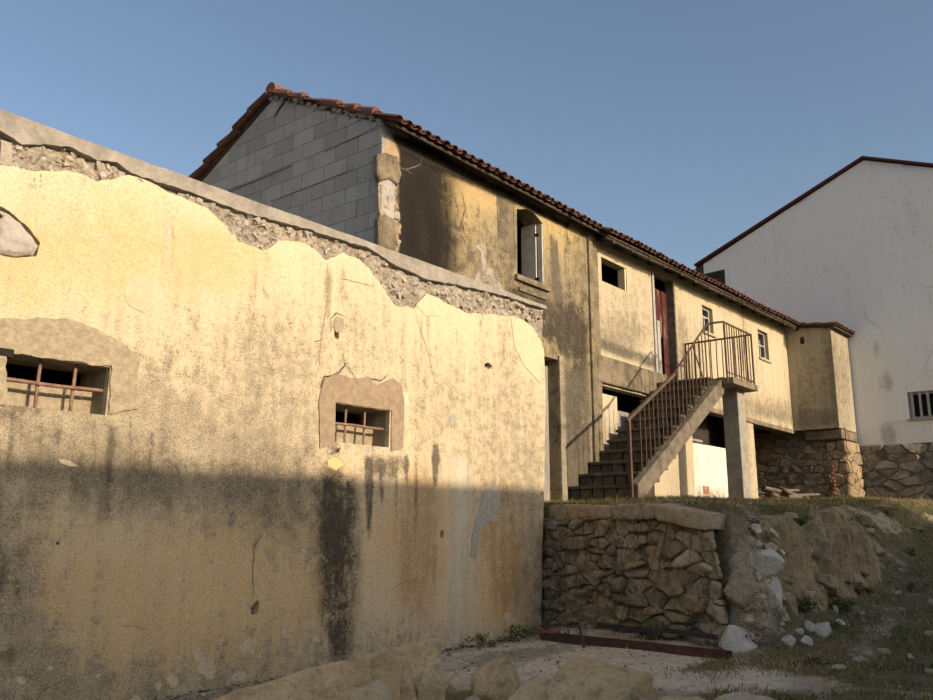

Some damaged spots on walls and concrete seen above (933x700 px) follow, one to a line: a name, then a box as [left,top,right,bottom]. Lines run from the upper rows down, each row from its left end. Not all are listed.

spalling [0,136,143,183]
spalling [0,211,38,257]
spalling [176,140,543,382]
water stain [515,235,584,356]
water stain [432,445,440,485]
water stain [565,369,590,486]
water stain [316,455,417,662]